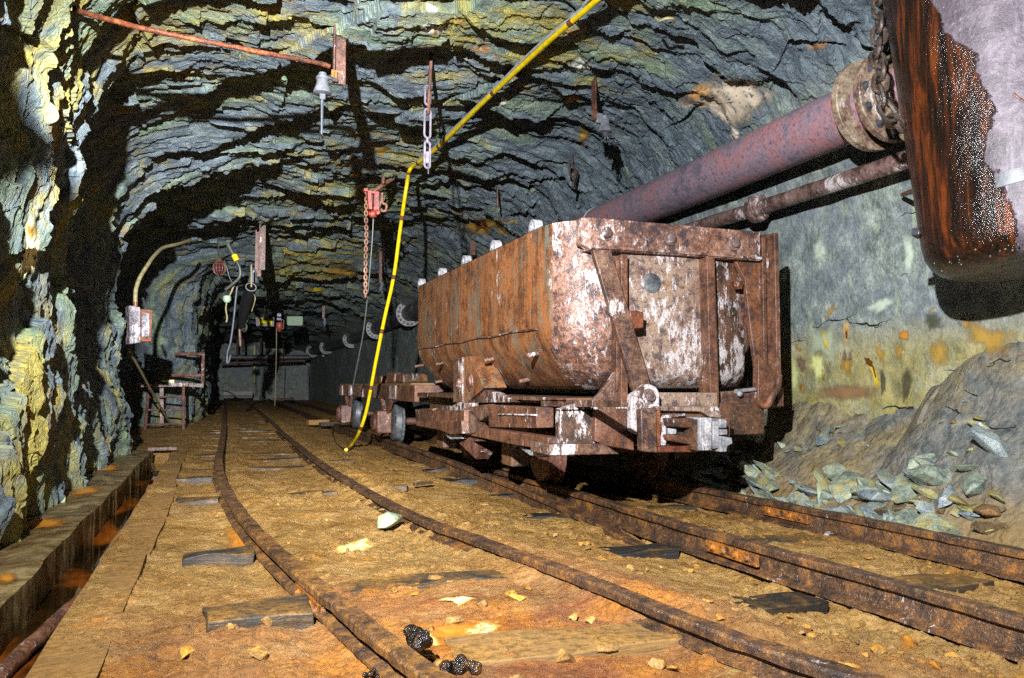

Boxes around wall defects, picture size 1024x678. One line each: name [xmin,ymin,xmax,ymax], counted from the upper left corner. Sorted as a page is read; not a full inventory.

crack [791,317,892,343]
rust [841,322,851,373]
rust [897,331,909,356]
rust [964,321,1005,352]
rust [795,332,883,398]